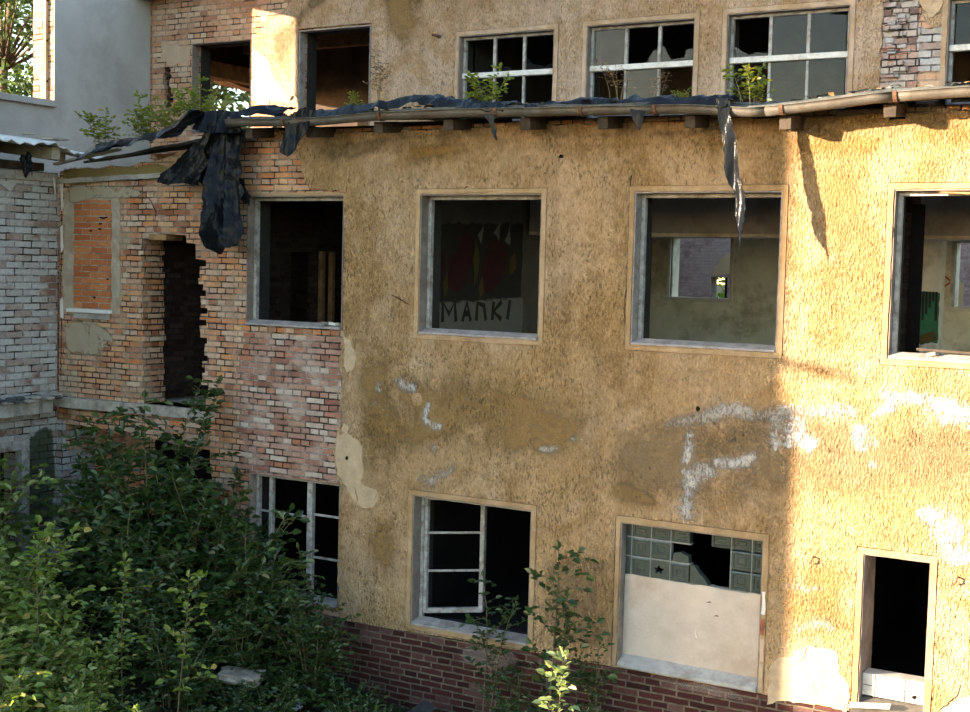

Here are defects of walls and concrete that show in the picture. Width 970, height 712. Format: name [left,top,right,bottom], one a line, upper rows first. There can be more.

peeling [251,49,298,103]
peeling [881,0,943,78]
peeling [335,423,379,508]
peeling [759,592,850,712]
peeling [941,696,970,712]